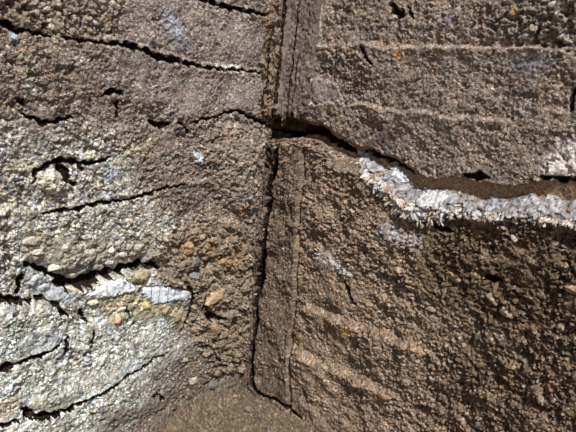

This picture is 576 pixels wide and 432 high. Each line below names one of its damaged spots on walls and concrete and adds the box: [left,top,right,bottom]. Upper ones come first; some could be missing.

damp [355,149,576,231]
crack [463,170,490,182]
damp [539,135,576,177]
crack [540,175,576,183]
crack [0,0,415,428]
damp [86,279,191,304]